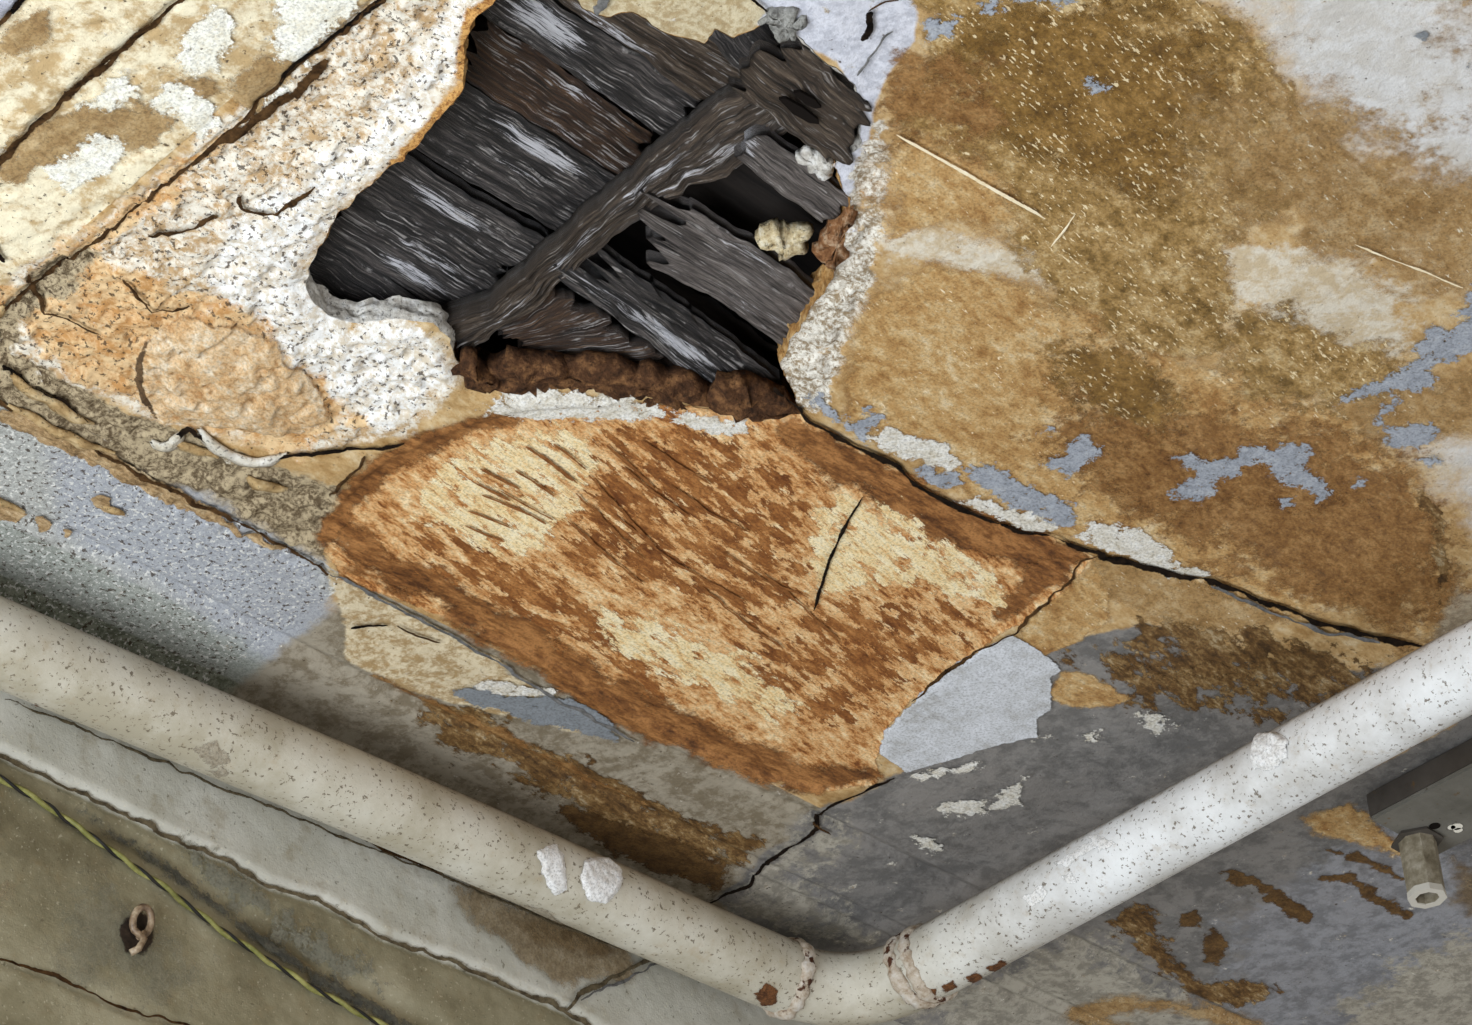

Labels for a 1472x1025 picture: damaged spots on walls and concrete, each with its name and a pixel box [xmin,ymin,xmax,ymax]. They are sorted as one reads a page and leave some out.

crack [0,0,386,334]
peeling [264,0,359,68]
flaking render [304,1,498,361]
damp [841,0,1472,726]
crack [0,699,657,1025]
corrosion [316,402,1094,796]
corrosion [754,983,778,1006]
corrosion [920,960,1007,1001]
peeling [879,635,1061,782]
crack [773,387,1422,702]
damp [1068,903,1284,1025]
damp [1302,803,1413,920]